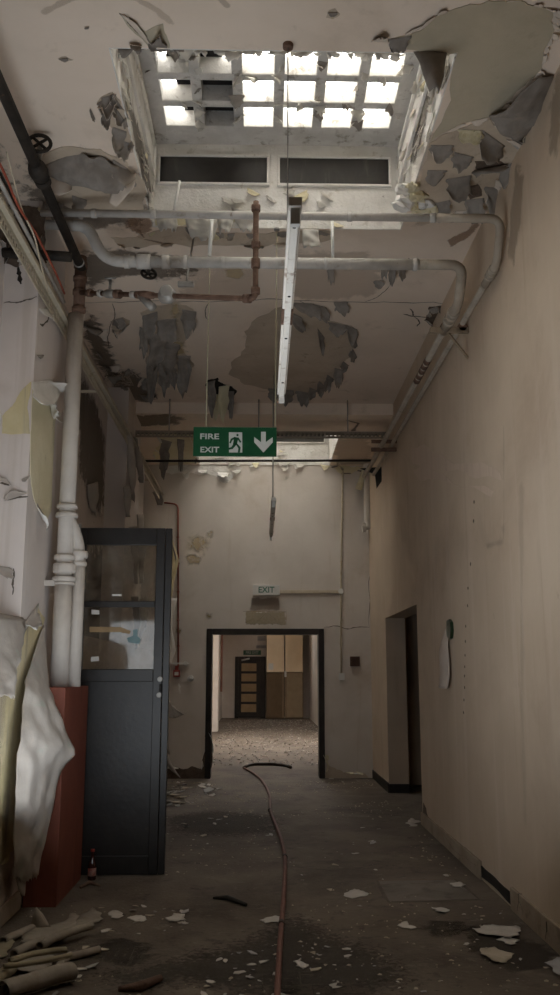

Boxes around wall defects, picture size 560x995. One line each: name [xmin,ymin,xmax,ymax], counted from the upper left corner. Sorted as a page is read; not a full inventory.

peeling [0,0,560,267]
peeling [110,304,196,404]
peeling [205,302,359,423]
flaking render [2,382,56,518]
flaking render [0,608,45,865]